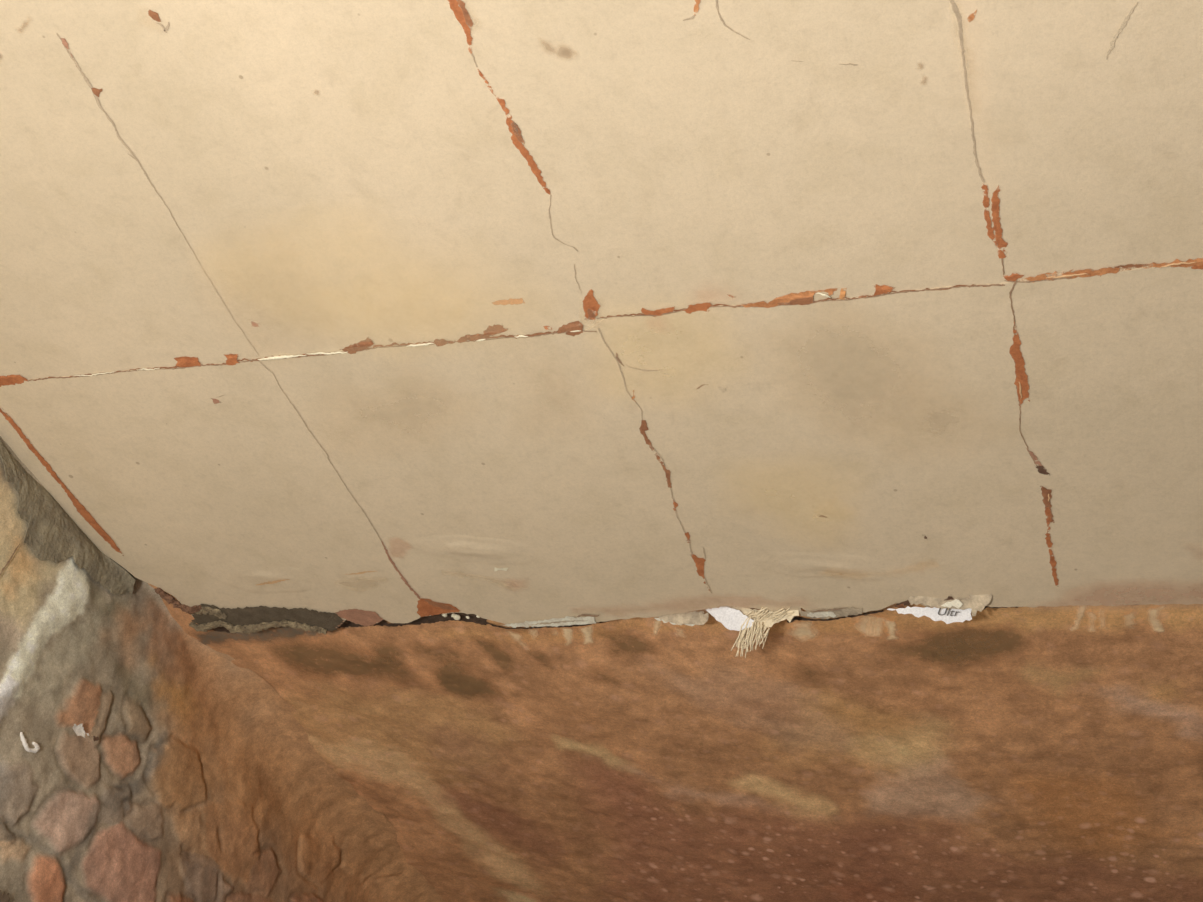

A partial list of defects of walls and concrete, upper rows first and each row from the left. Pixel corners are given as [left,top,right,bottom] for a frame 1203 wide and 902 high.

crack [0,0,1203,598]
spalling [155,588,384,635]
peeling [417,598,460,617]